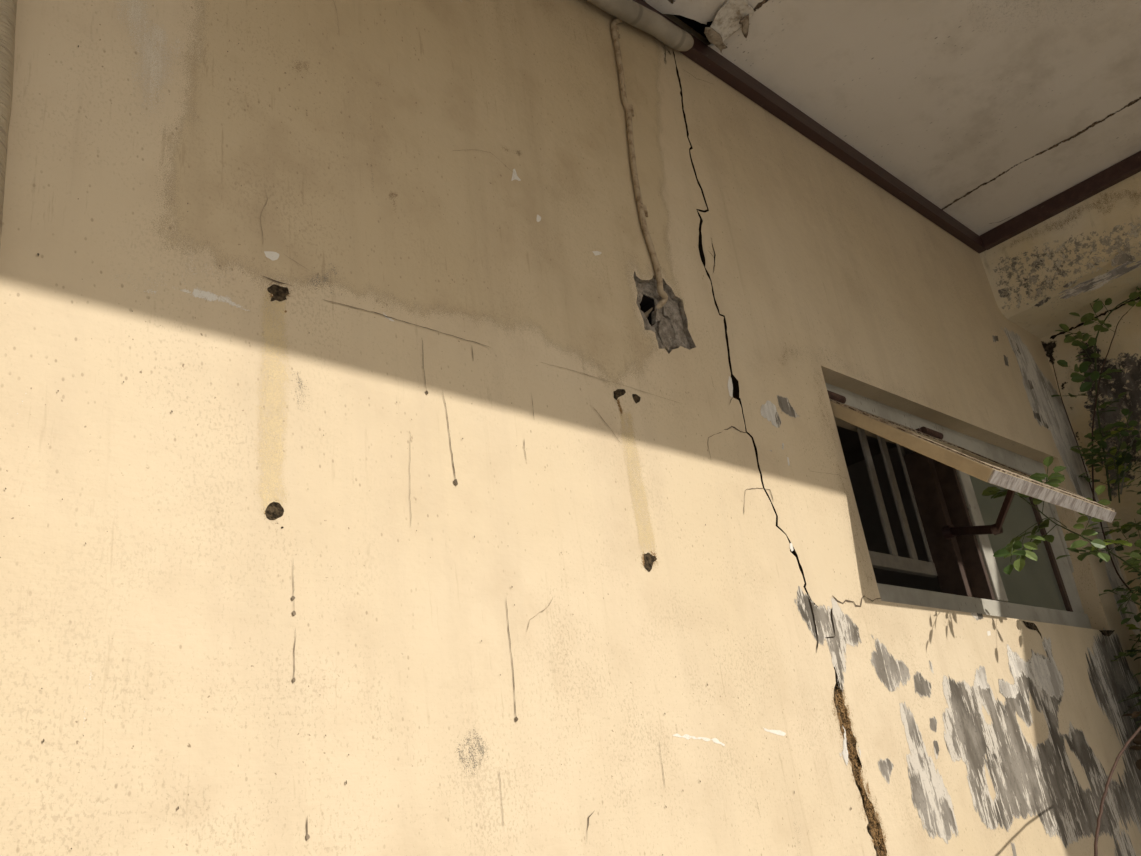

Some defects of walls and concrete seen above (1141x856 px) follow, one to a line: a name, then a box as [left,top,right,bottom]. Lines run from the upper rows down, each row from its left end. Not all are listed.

spalling [633,271,696,354]
crack [664,45,881,607]
peeling [761,395,799,428]
leakage [1041,341,1057,365]
peeling [992,327,1141,503]
crack [831,656,889,856]
peeling [794,515,1141,856]